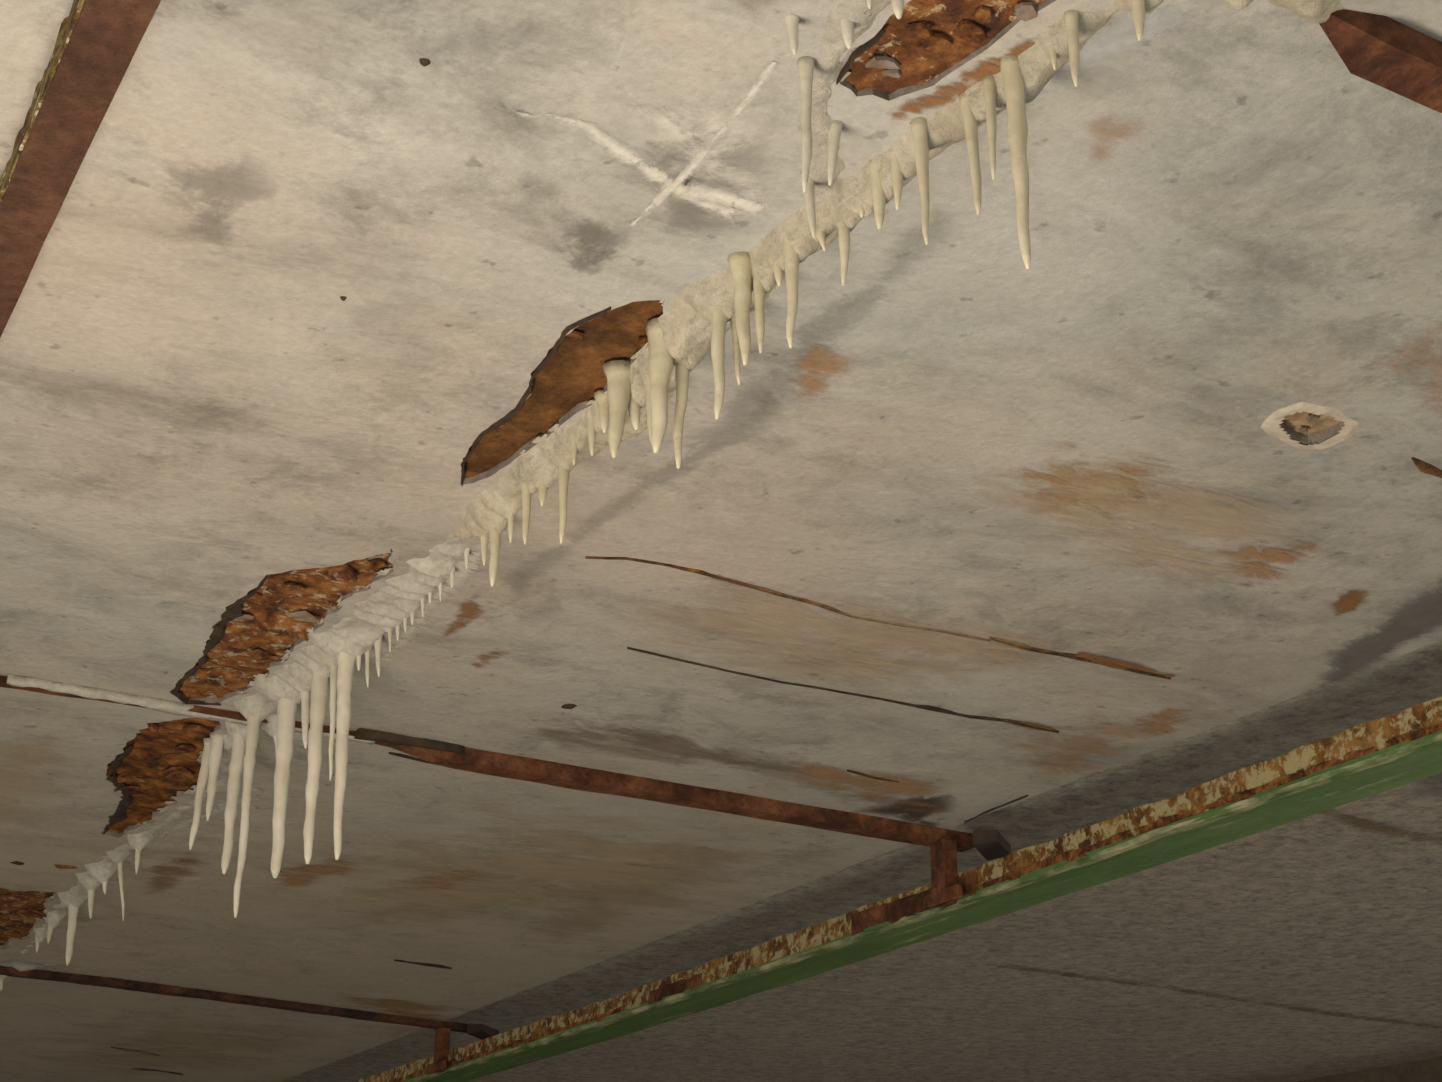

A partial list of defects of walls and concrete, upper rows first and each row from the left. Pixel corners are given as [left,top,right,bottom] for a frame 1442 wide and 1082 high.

spalling [836,0,1044,94]
water stain [1225,0,1344,24]
spalling [461,300,663,486]
spalling [1260,402,1359,450]
water stain [0,0,1164,991]
crack [585,556,1174,680]
water stain [1321,588,1442,691]
spalling [103,553,393,835]
rust [957,723,1442,896]
rust [851,887,932,936]
rust [447,1005,625,1067]
rust [648,973,702,1005]